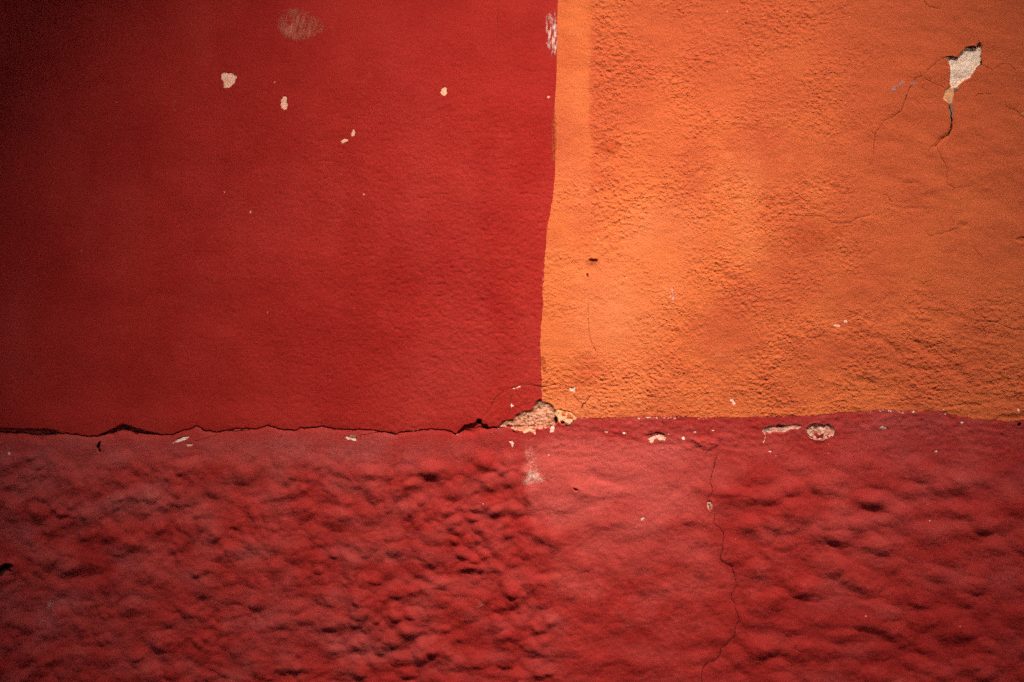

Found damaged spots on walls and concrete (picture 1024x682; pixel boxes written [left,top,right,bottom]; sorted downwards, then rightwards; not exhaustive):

spalling [221,73,237,88]
crack [870,76,940,165]
flaking render [926,40,1015,188]
crack [0,370,590,441]
flaking render [495,389,577,447]
flaking render [763,423,835,452]
crack [701,452,740,681]